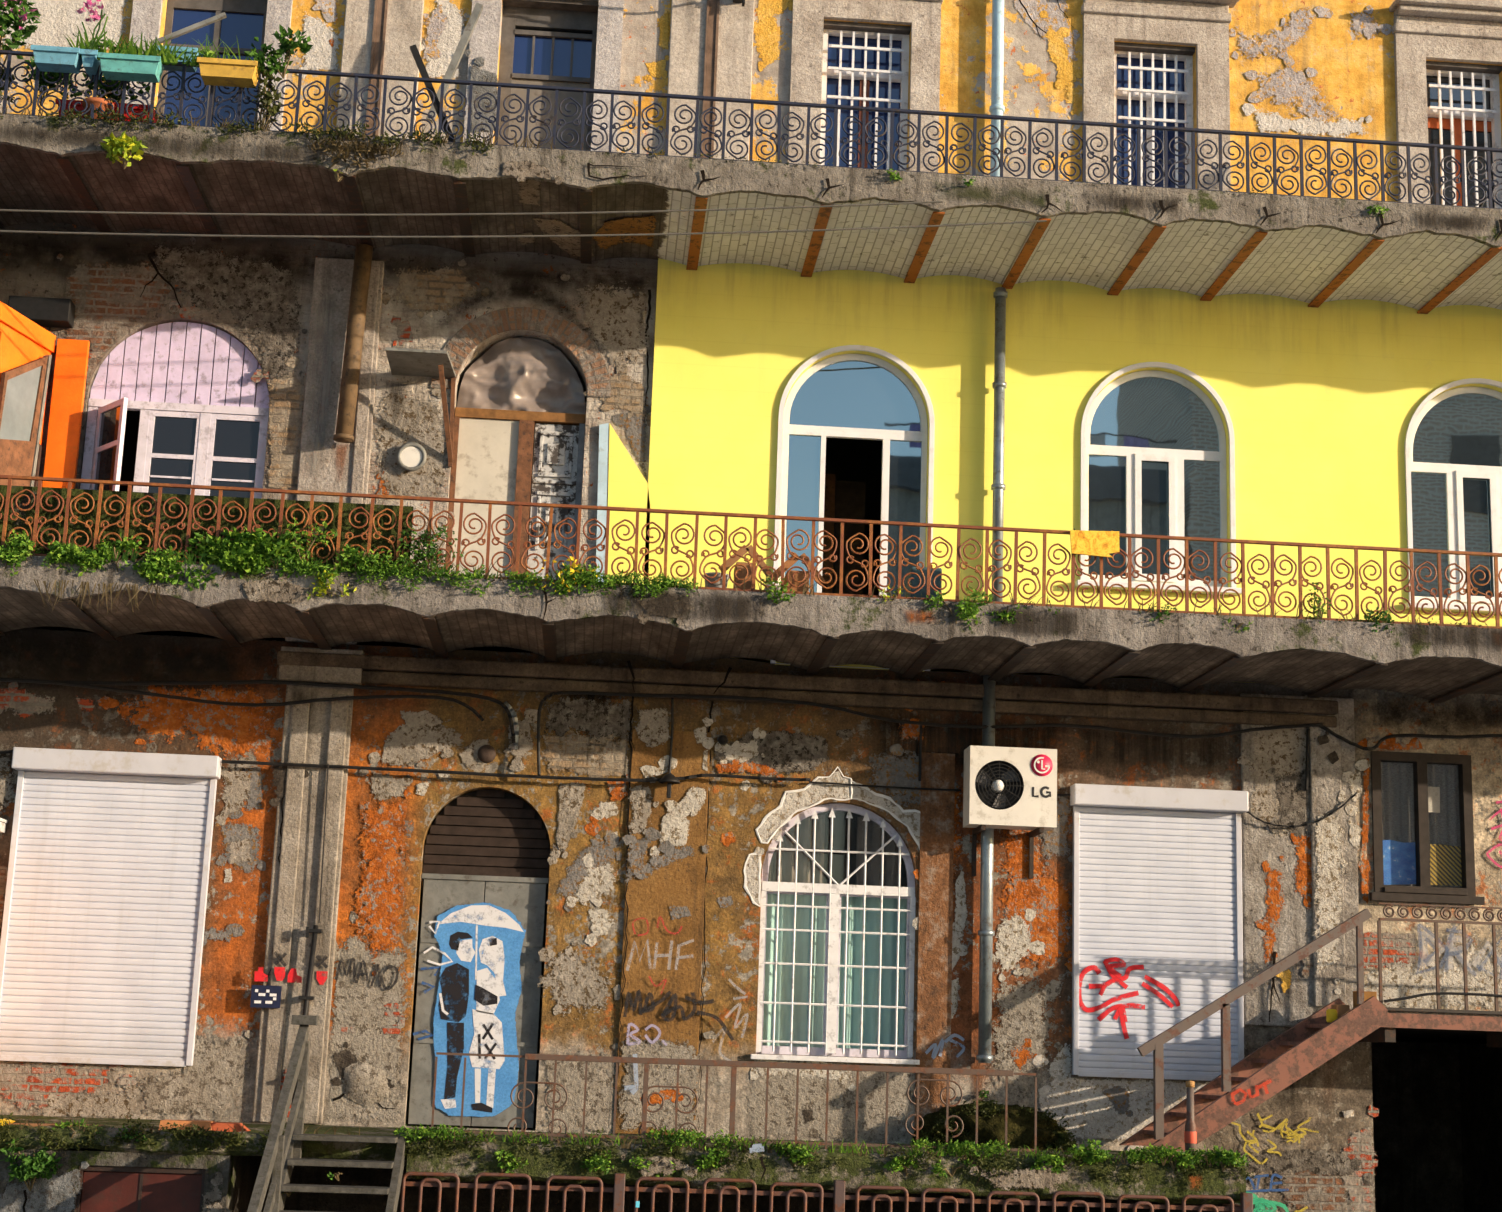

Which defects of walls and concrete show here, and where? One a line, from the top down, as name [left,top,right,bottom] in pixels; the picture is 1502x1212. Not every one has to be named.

peeling [0,0,130,51]
peeling [753,42,781,72]
flaking render [1013,0,1083,89]
peeling [1229,5,1392,138]
peeling [0,680,309,883]
flaking render [323,696,937,1143]
spalling [951,771,968,1019]
flaking render [982,796,1209,1151]
peeling [1237,695,1371,995]
crack [20,1190,28,1212]
spalling [621,1153,698,1178]